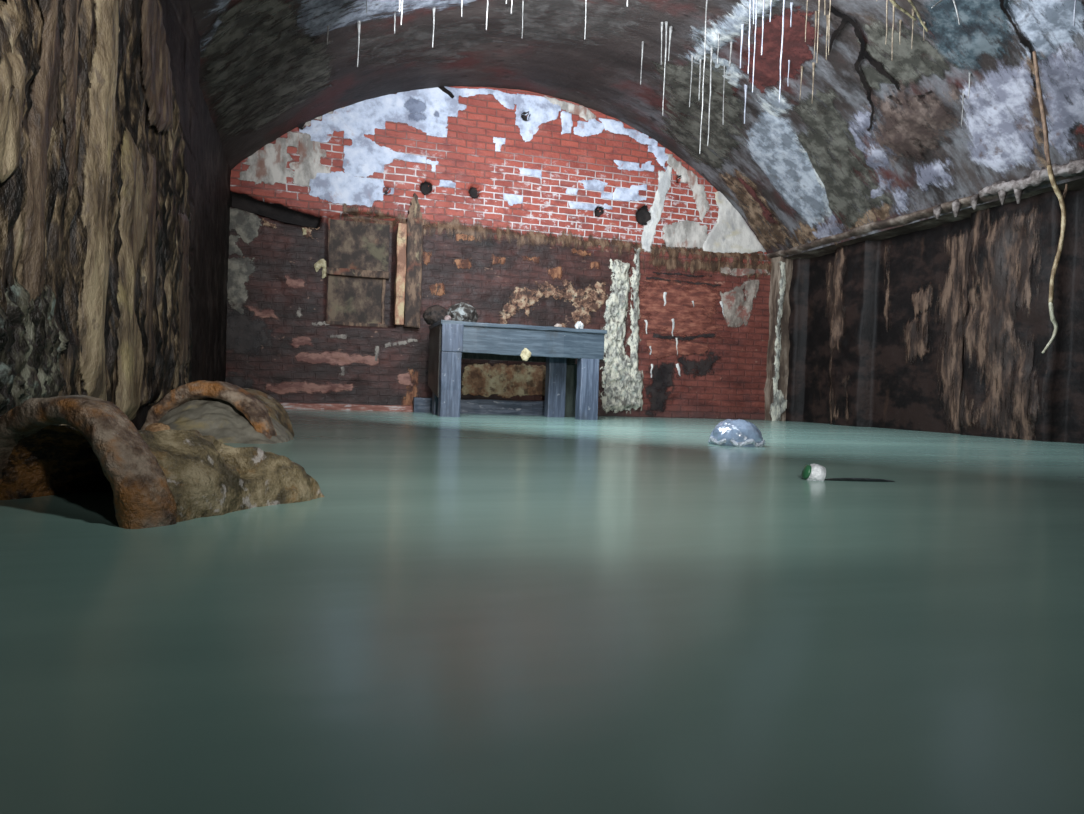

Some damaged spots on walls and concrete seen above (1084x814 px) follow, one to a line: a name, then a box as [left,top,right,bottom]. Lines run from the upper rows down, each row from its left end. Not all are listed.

water stain [350,0,647,66]
water stain [686,0,779,87]
crack [827,5,932,131]
peeling [858,21,958,91]
water stain [917,0,1016,70]
crack [999,0,1036,90]
peeling [227,6,909,329]
peeling [915,160,953,191]
water stain [933,159,1084,219]
peeling [291,336,379,366]
water stain [422,166,787,421]
spalling [635,267,770,359]